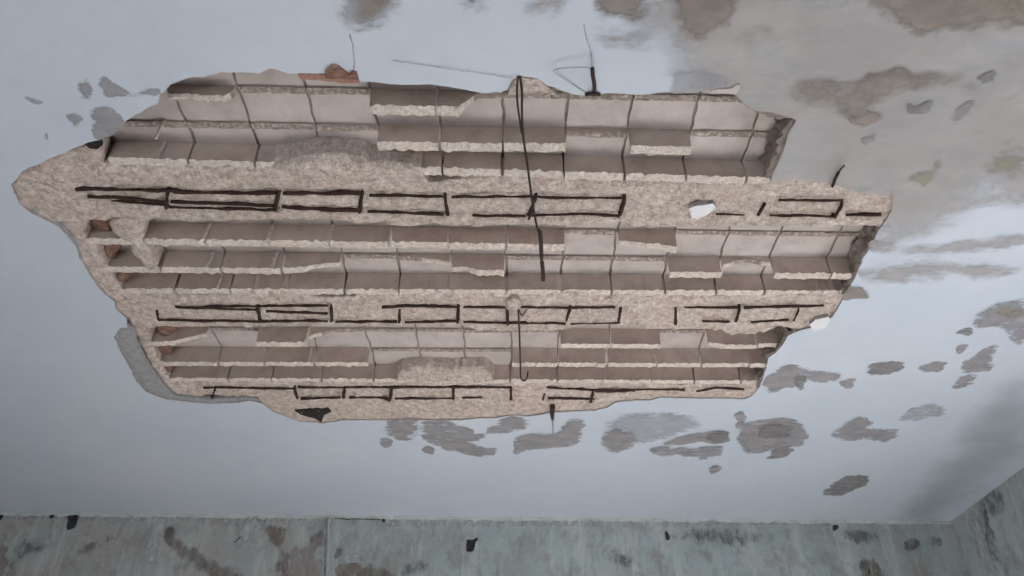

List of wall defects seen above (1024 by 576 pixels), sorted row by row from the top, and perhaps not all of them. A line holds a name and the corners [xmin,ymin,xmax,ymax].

damp [595,0,1024,249]
spalling [13,64,893,457]
damp [946,238,1024,252]
damp [843,266,1010,301]
peeling [867,361,904,375]